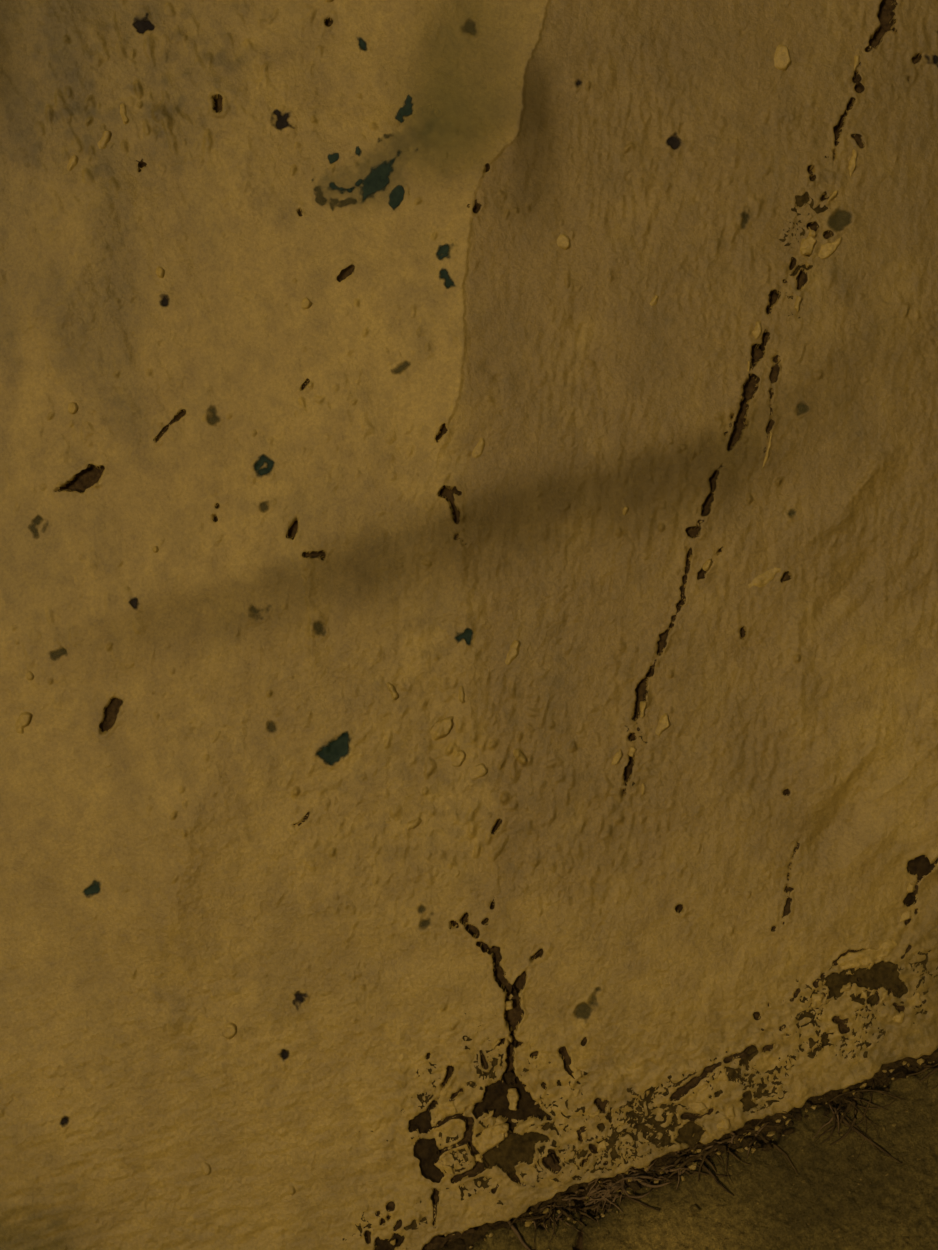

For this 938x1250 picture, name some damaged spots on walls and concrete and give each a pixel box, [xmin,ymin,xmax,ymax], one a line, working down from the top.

crack [612,0,897,795]
crack [449,896,543,1086]
crack [573,1196,587,1250]
flaking render [342,939,938,1250]